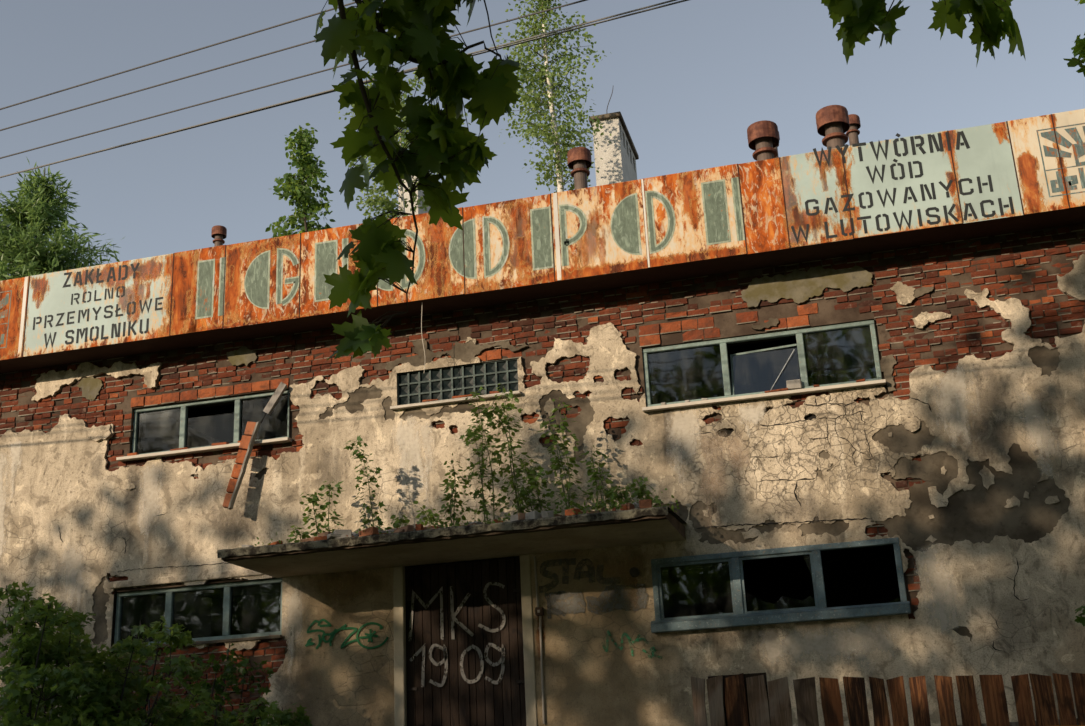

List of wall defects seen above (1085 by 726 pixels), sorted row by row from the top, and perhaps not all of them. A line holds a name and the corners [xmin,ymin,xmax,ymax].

corrosion [677,171,700,229]
corrosion [775,146,938,248]
corrosion [941,130,1045,224]
corrosion [0,276,49,360]
corrosion [72,231,401,337]
spalling [0,223,1085,480]
corrosion [415,200,750,301]
crack [761,399,873,465]
peeling [655,501,849,544]
crack [696,456,872,529]
peeling [866,416,1070,619]
spalling [129,635,287,726]